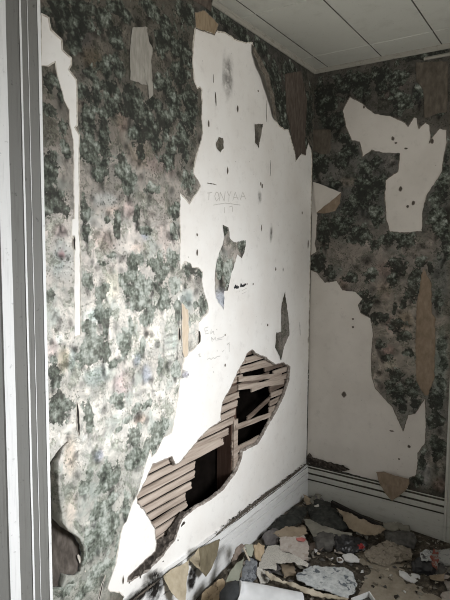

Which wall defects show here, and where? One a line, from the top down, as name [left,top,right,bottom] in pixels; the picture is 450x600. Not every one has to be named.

peeling [41,13,82,337]
peeling [108,28,426,600]
peeling [342,96,448,233]
water stain [129,570,163,600]